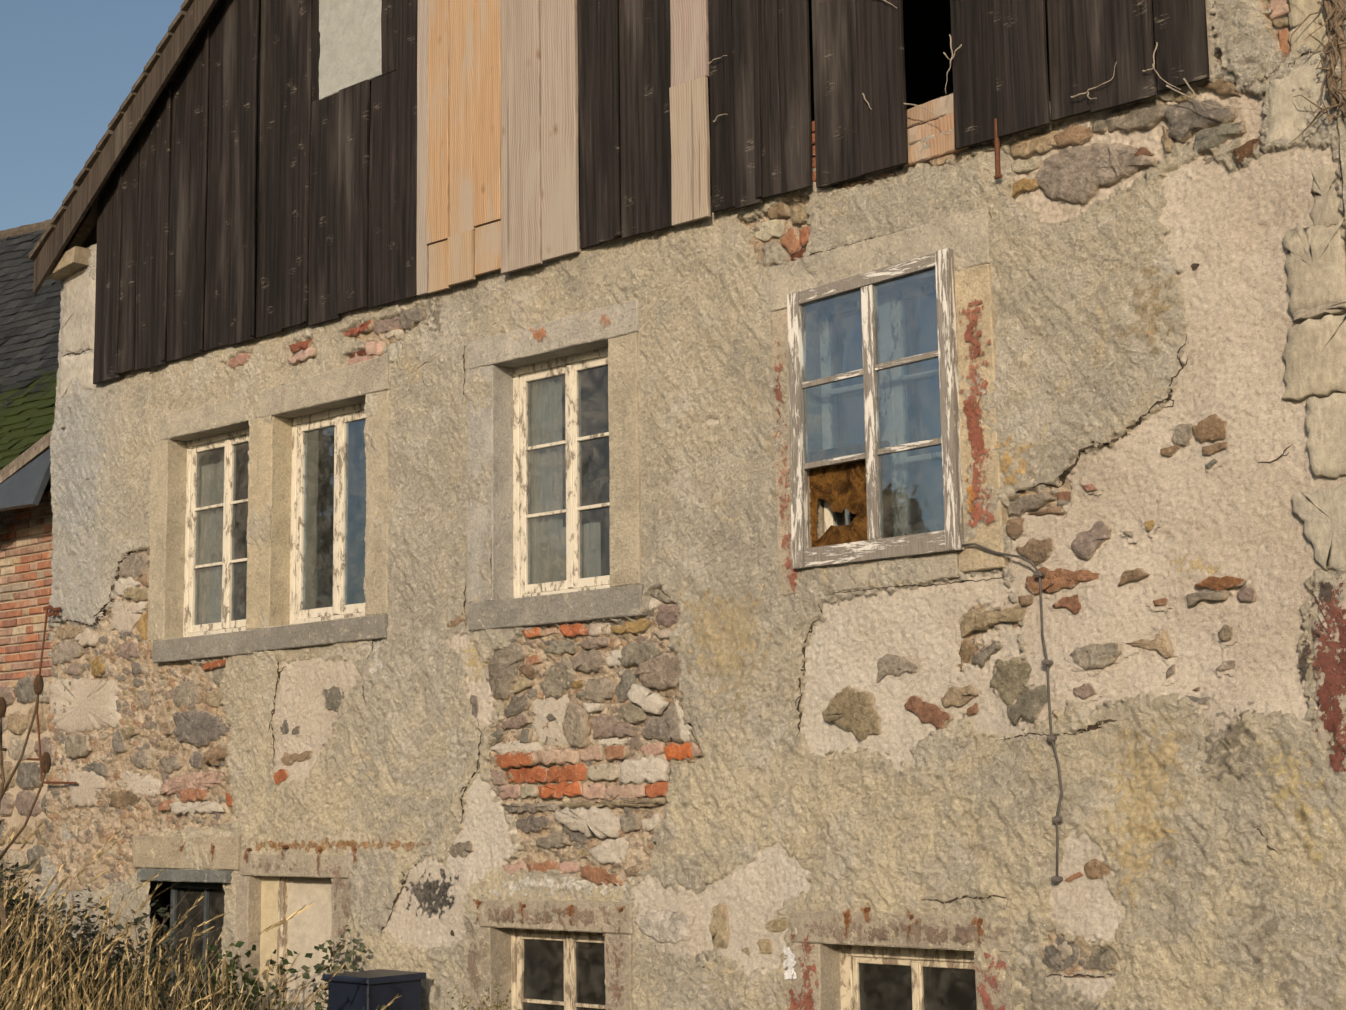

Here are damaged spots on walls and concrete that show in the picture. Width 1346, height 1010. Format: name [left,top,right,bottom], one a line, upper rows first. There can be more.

spalling [223,351,251,371]
spalling [287,339,317,366]
spalling [342,307,428,365]
peeling [799,0,1346,773]
crack [1009,335,1188,497]
spalling [44,549,238,892]
crack [268,655,286,767]
crack [460,720,482,823]
spalling [384,588,1006,1010]
leakage [399,869,459,919]